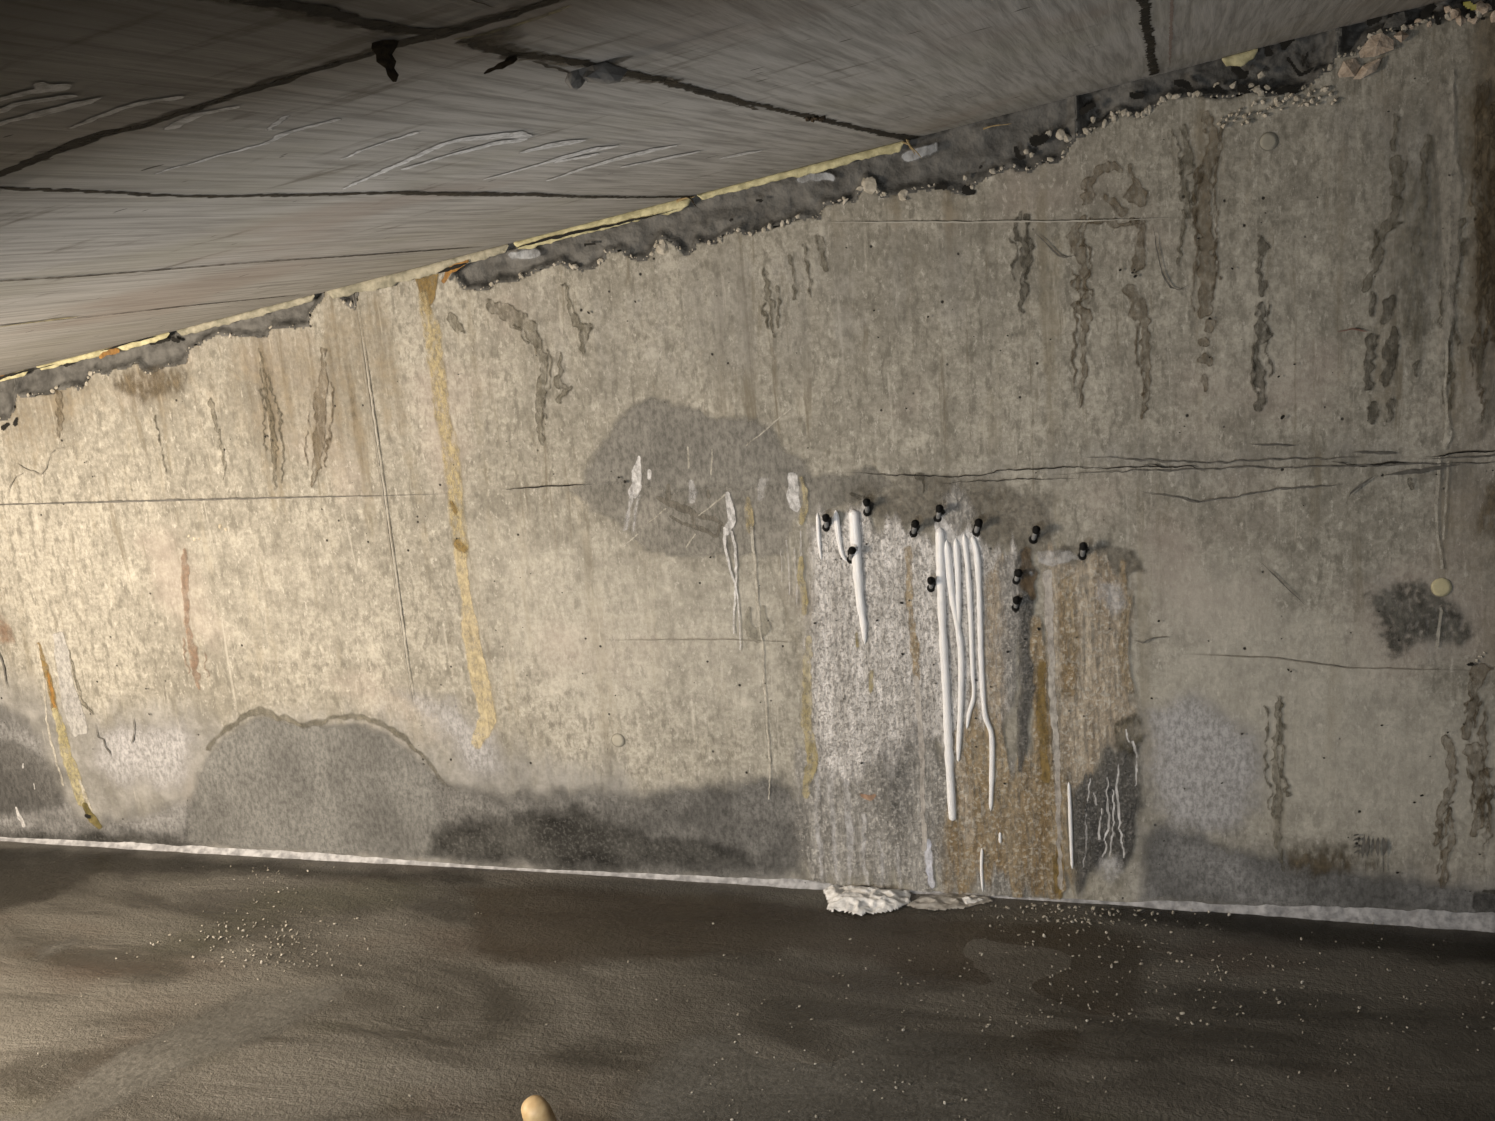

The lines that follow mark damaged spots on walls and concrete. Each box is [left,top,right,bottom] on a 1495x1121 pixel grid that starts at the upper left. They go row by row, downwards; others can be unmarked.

water stain [339,131,701,189]
spalling [455,0,1495,291]
spalling [0,292,359,431]
water stain [1009,214,1035,313]
water stain [1250,236,1273,411]
water stain [1362,83,1495,425]
crack [506,483,590,491]
crack [856,444,1495,503]
rust [905,546,920,680]
water stain [0,632,818,907]
rust [945,546,1135,900]
water stain [850,473,1495,961]